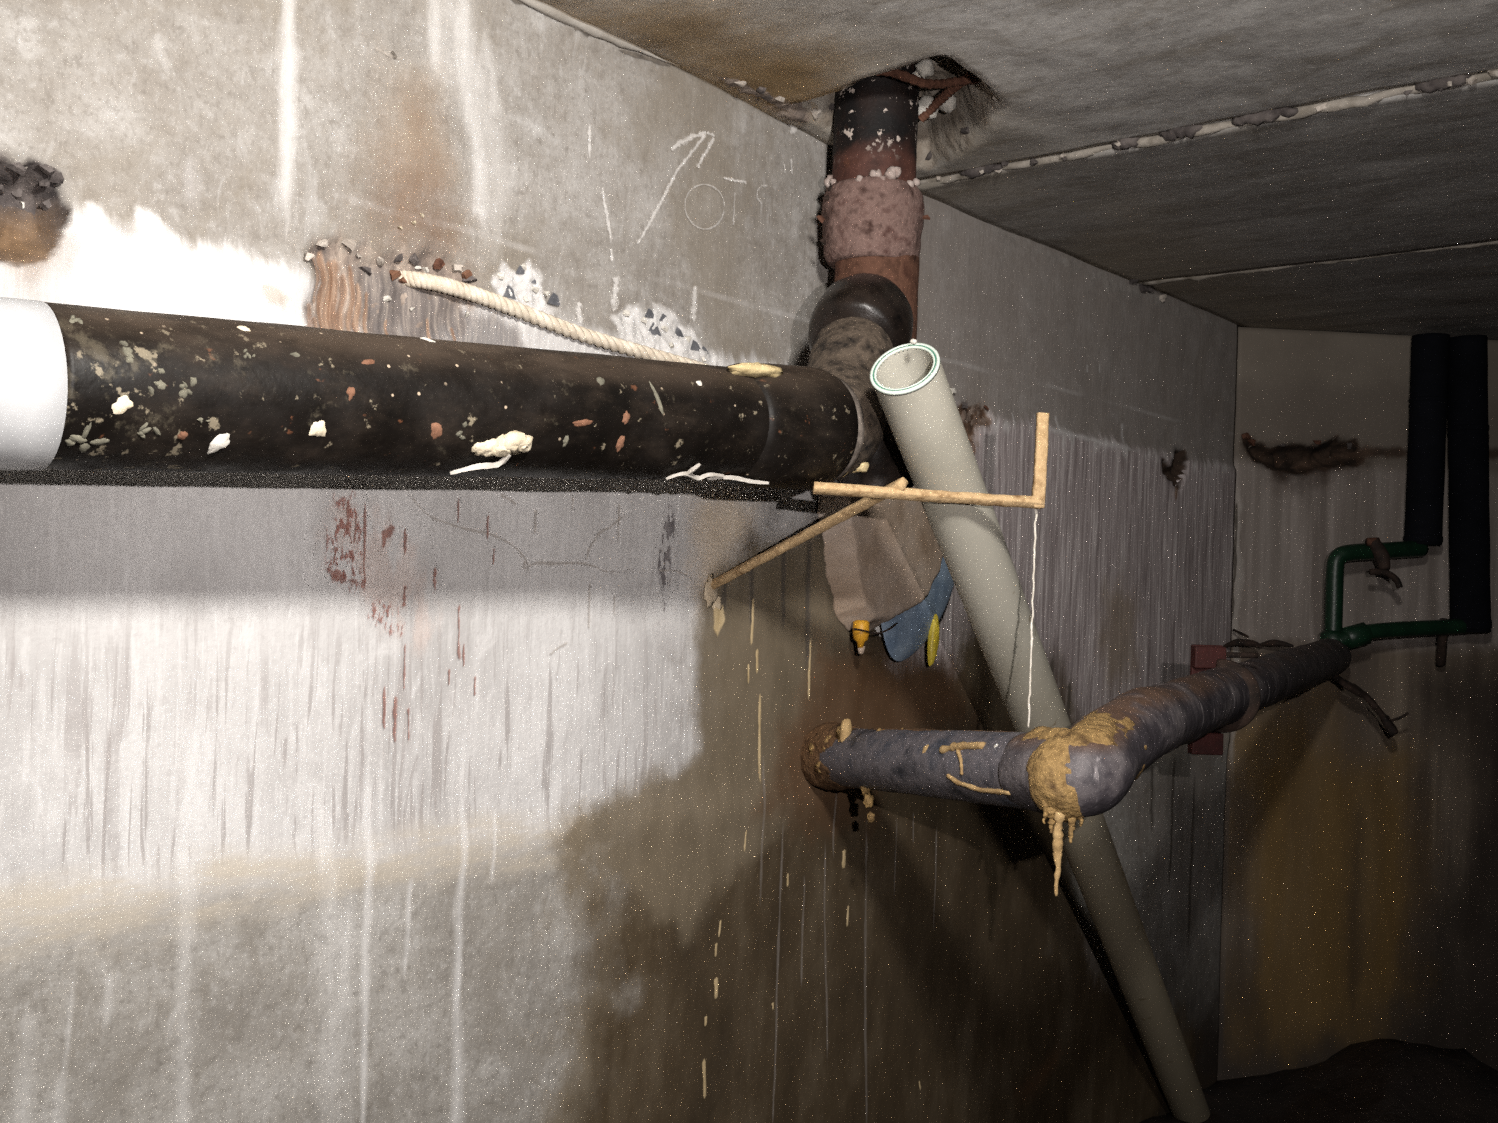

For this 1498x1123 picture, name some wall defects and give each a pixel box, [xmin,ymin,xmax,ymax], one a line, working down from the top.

damp [635,16,814,97]
peeling [0,156,288,321]
spalling [303,238,560,347]
peeling [613,307,719,366]
corrosion [326,496,407,589]
corrosion [372,586,410,741]
corrosion [448,606,476,695]
damp [550,533,1168,1123]
damp [1432,672,1498,1071]